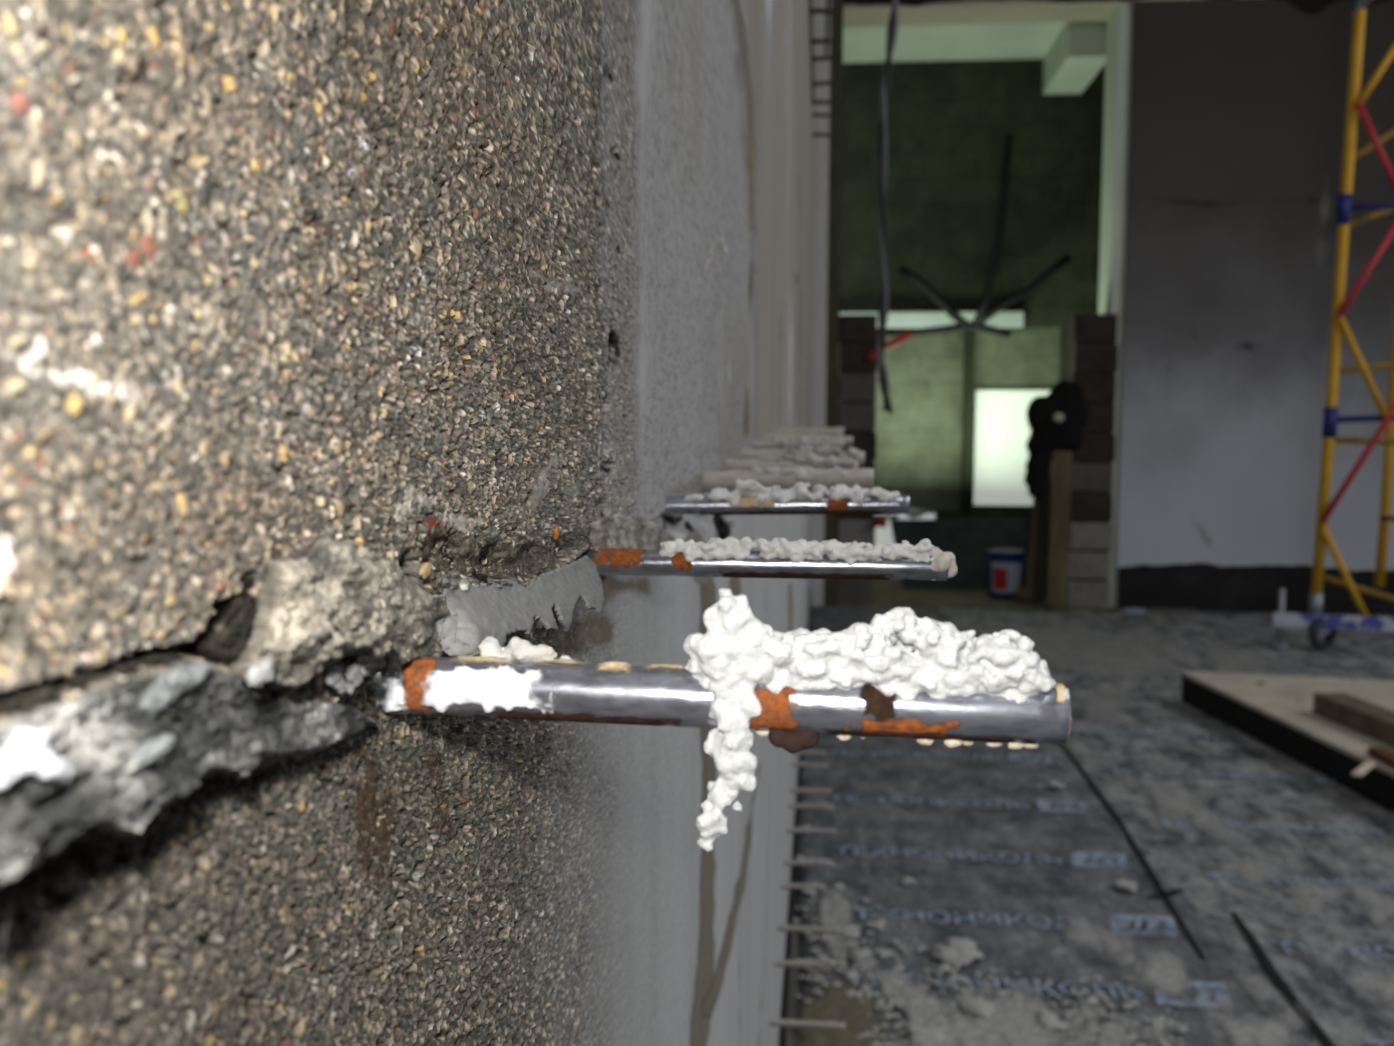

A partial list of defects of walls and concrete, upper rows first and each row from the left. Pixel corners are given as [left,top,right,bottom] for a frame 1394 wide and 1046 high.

crack [0,574,257,716]
spalling [219,602,253,663]
water stain [695,577,740,634]
water stain [701,728,716,814]
water stain [691,809,753,1046]